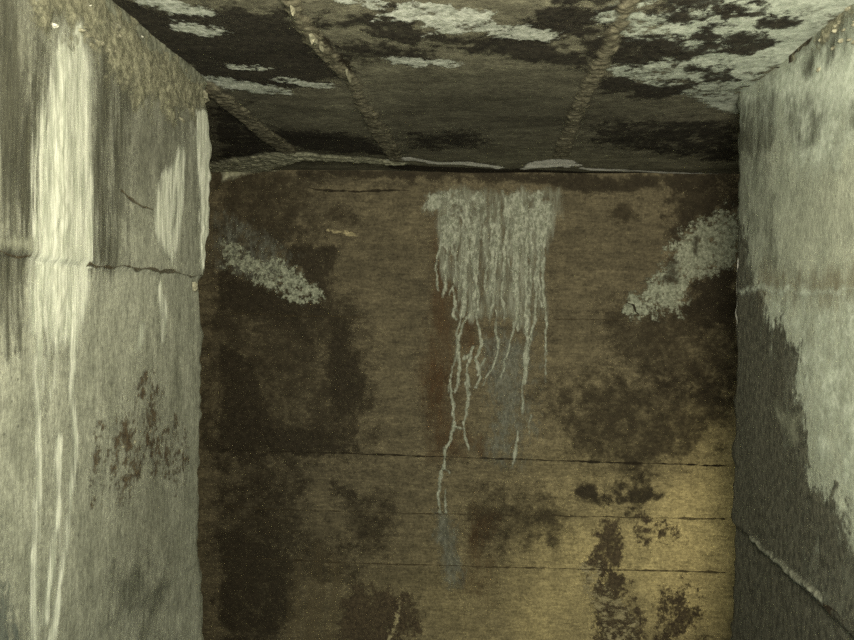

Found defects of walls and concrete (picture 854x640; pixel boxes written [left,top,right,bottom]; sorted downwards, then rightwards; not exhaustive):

water stain [0,0,132,640]
water stain [112,0,854,169]
water stain [200,107,854,640]